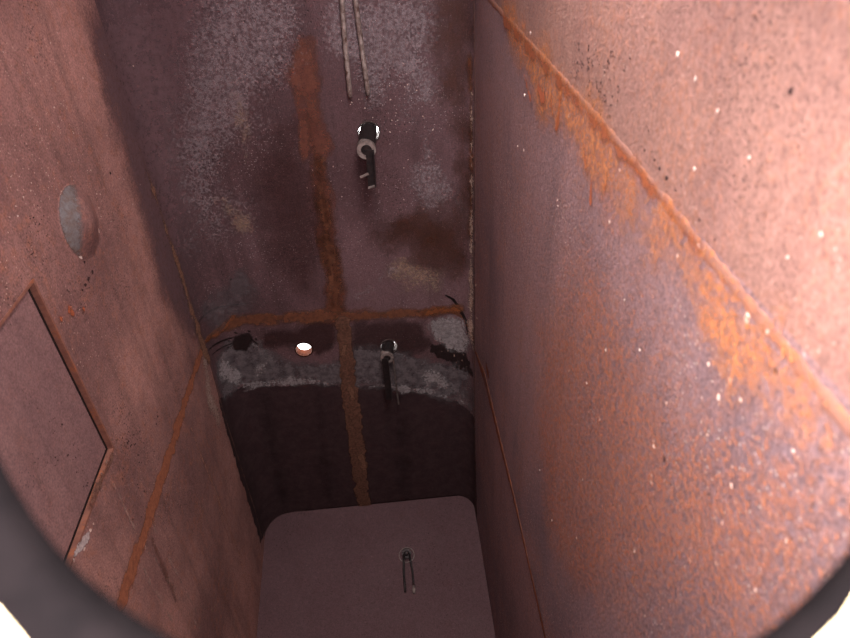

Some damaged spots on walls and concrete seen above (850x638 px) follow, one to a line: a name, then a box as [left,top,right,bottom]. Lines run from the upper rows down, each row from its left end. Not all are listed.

rust [503,1,677,254]
rust [117,37,464,608]
water stain [428,317,469,352]
rust [682,264,769,390]